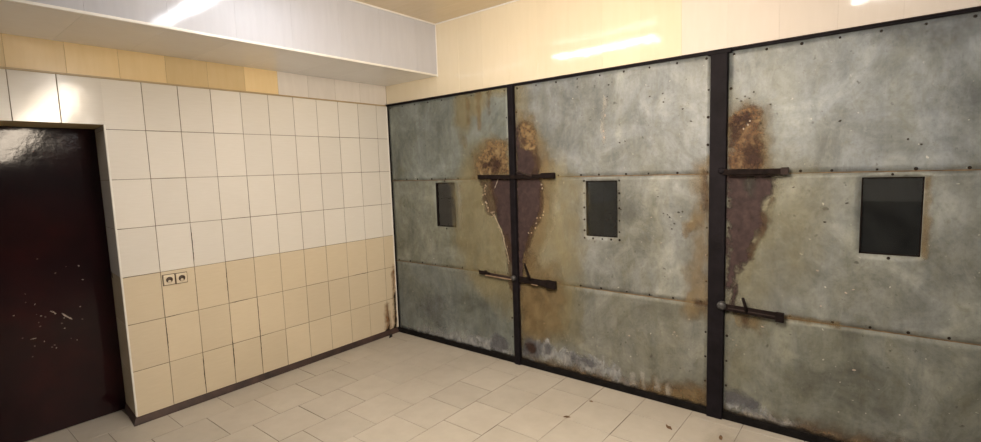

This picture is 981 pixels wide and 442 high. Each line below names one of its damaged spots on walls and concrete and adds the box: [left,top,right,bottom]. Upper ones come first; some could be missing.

water stain [386,270,397,331]
water stain [409,325,631,387]
corrosion [475,117,706,405]
corrosion [725,104,775,305]